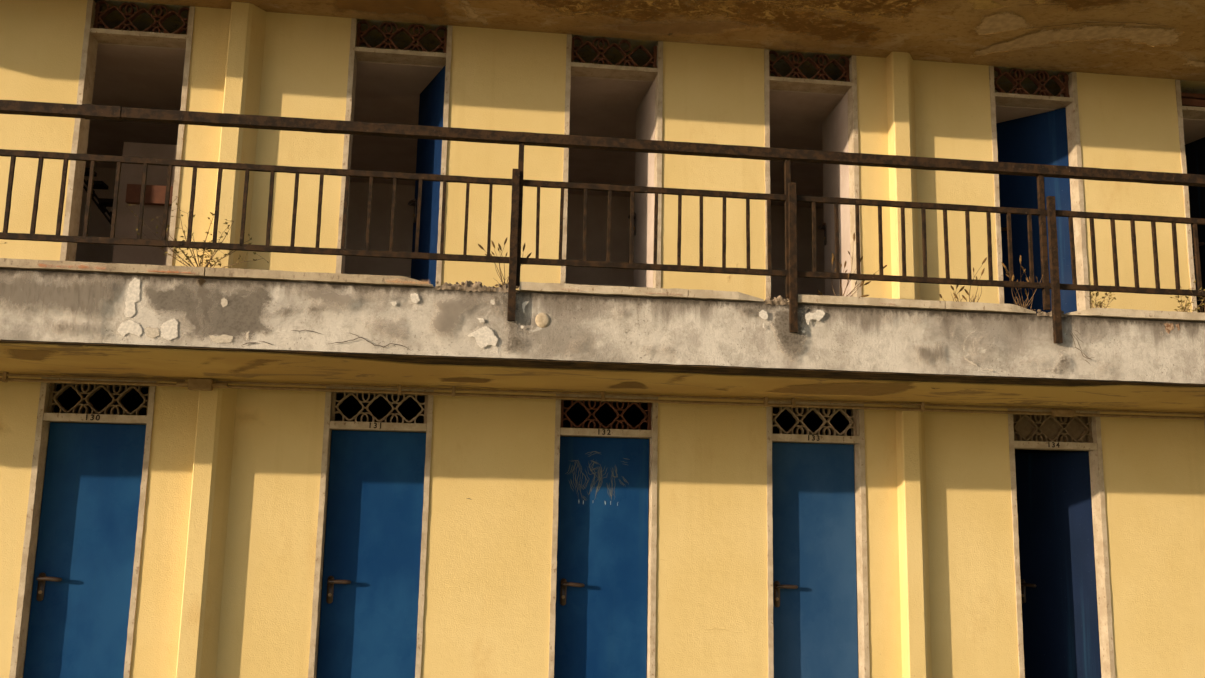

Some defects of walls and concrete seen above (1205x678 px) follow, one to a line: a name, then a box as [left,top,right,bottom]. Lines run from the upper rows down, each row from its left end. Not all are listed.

leakage [534,0,930,47]
peeling [971,12,1180,57]
leakage [1052,0,1129,11]
peeling [117,278,178,340]
leakage [144,278,291,338]
peeling [209,332,249,343]
crack [243,330,412,351]
spalling [434,281,528,328]
peeling [467,318,498,351]
peeling [802,310,825,333]